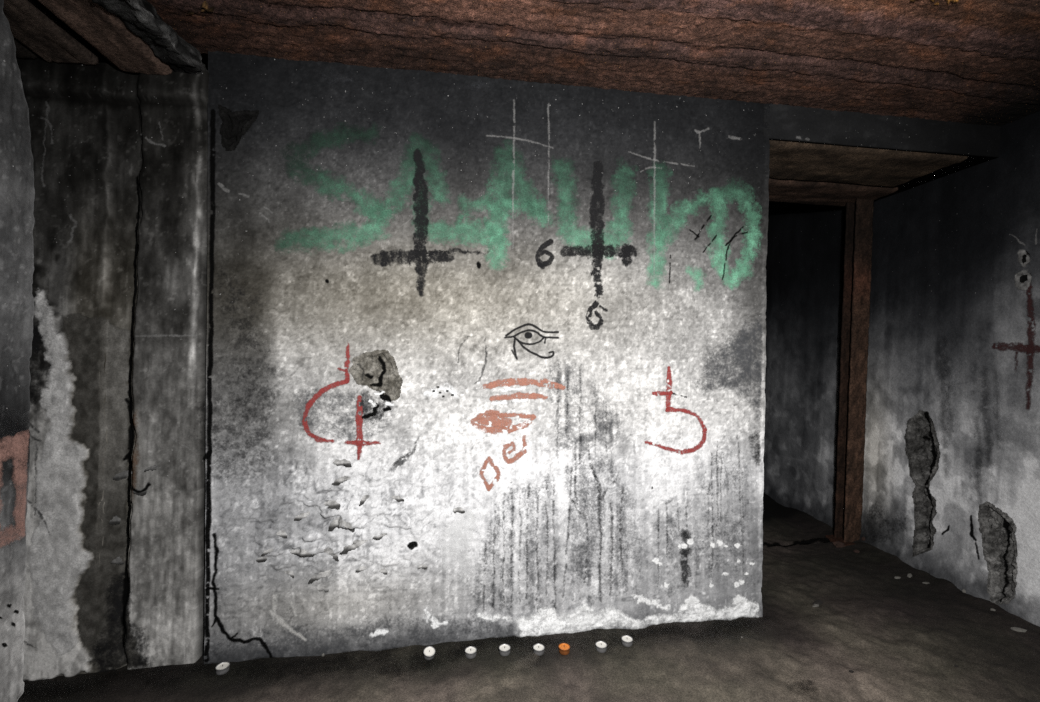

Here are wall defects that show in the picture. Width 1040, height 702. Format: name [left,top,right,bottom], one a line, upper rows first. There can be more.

crack [121,176,151,648]
crack [203,109,273,662]
spalling [349,350,403,419]
water stain [559,371,613,455]
flaking render [27,291,158,668]
water stain [352,623,390,637]
water stain [415,525,759,644]
water stain [553,463,627,583]
spalling [904,410,940,557]
spalling [978,501,1018,611]